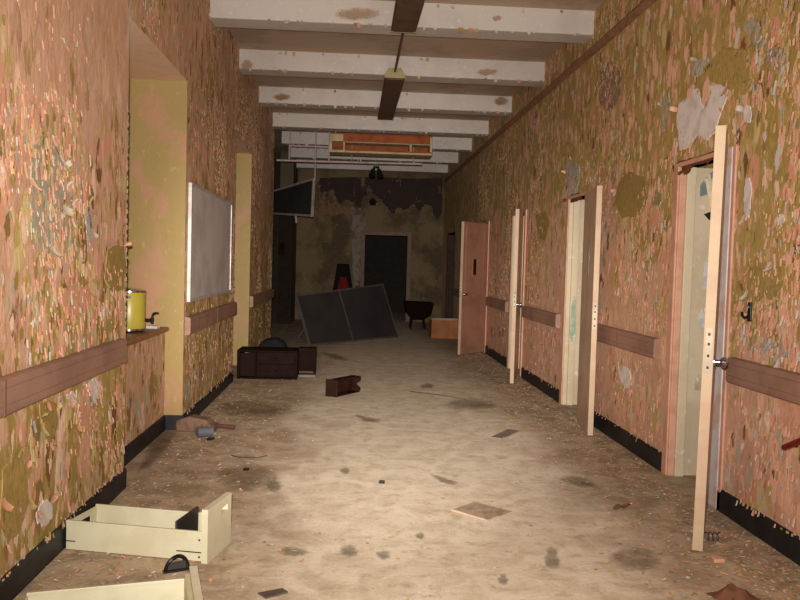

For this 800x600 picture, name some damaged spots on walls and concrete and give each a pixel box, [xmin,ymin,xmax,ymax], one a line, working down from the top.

peeling [34,0,93,59]
damp [339,10,375,20]
peeling [0,71,132,365]
peeling [190,0,320,293]
peeling [316,177,443,287]
peeling [455,93,519,301]
peeling [561,0,800,372]
peeling [185,319,233,415]
peeling [598,355,660,452]
peeling [0,375,125,582]
peeling [774,506,800,540]